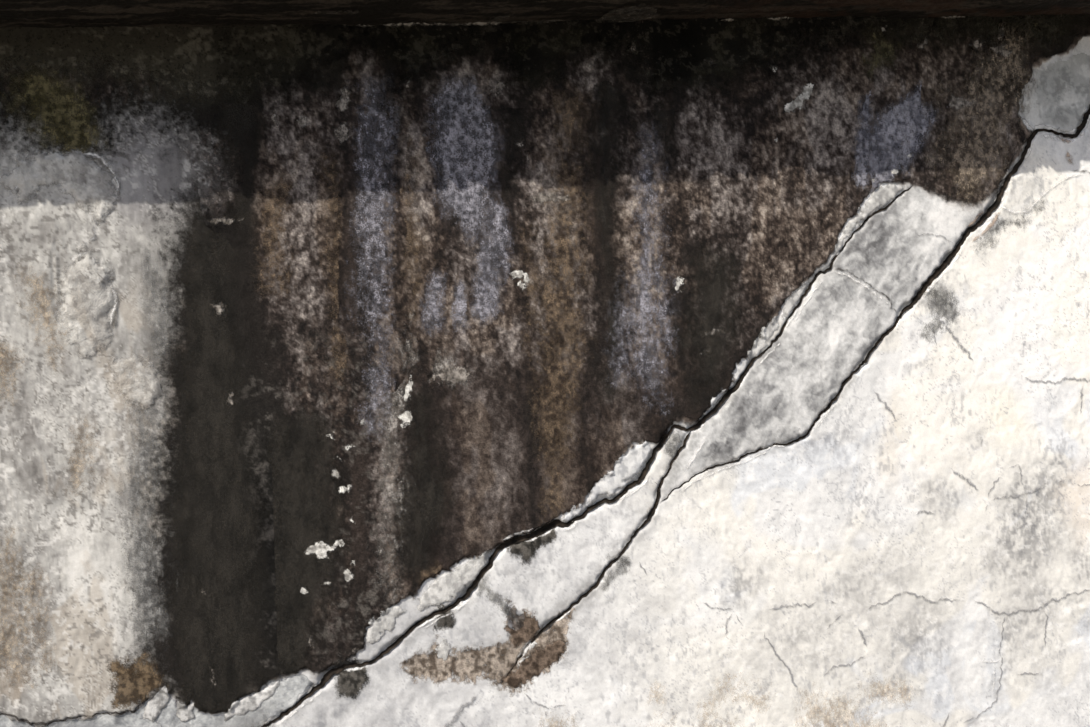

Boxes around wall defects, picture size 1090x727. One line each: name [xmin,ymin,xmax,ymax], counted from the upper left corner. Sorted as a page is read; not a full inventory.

flaking render [835,169,903,255]
water stain [976,216,1026,250]
water stain [922,286,959,342]
crack [262,105,1090,727]
flaking render [560,441,651,522]
water stain [128,504,161,634]
peeling [305,539,344,559]
flaking render [358,550,491,650]
water stain [434,604,456,630]
spalling [401,600,575,695]
water stain [507,528,556,563]
crack [0,698,162,727]